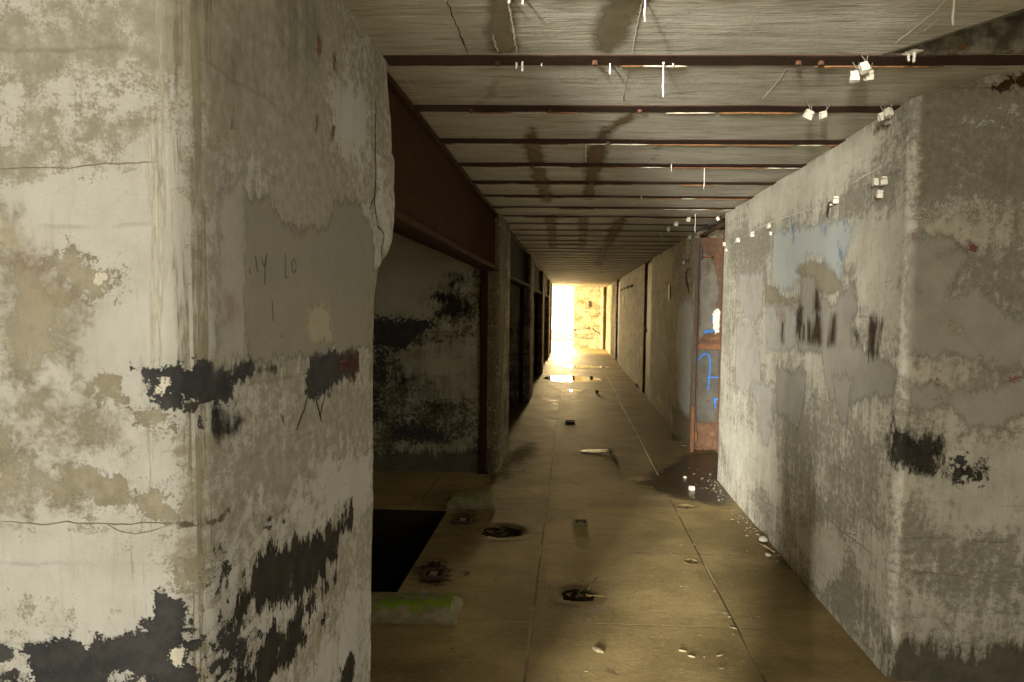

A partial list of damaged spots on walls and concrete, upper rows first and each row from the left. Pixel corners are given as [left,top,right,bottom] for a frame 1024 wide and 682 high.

leakage [486,0,517,53]
leakage [593,0,644,53]
crack [0,161,147,169]
crack [370,103,384,270]
leakage [430,272,475,323]
peeling [0,0,356,682]
rust [694,421,717,451]
crack [0,521,178,535]